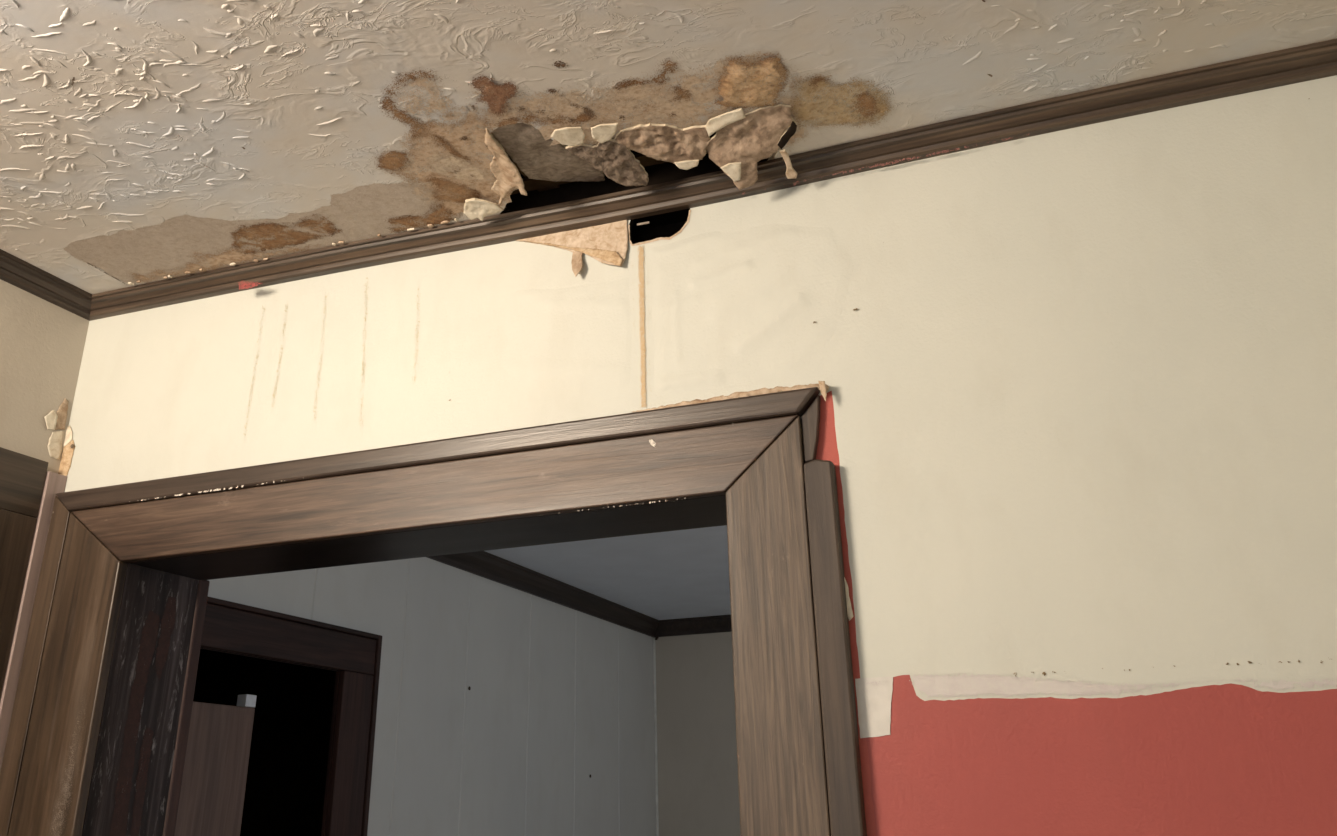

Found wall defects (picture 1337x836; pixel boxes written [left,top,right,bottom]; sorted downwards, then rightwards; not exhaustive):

flaking render [463,104,797,221]
spalling [627,208,691,246]
peeling [45,399,75,476]